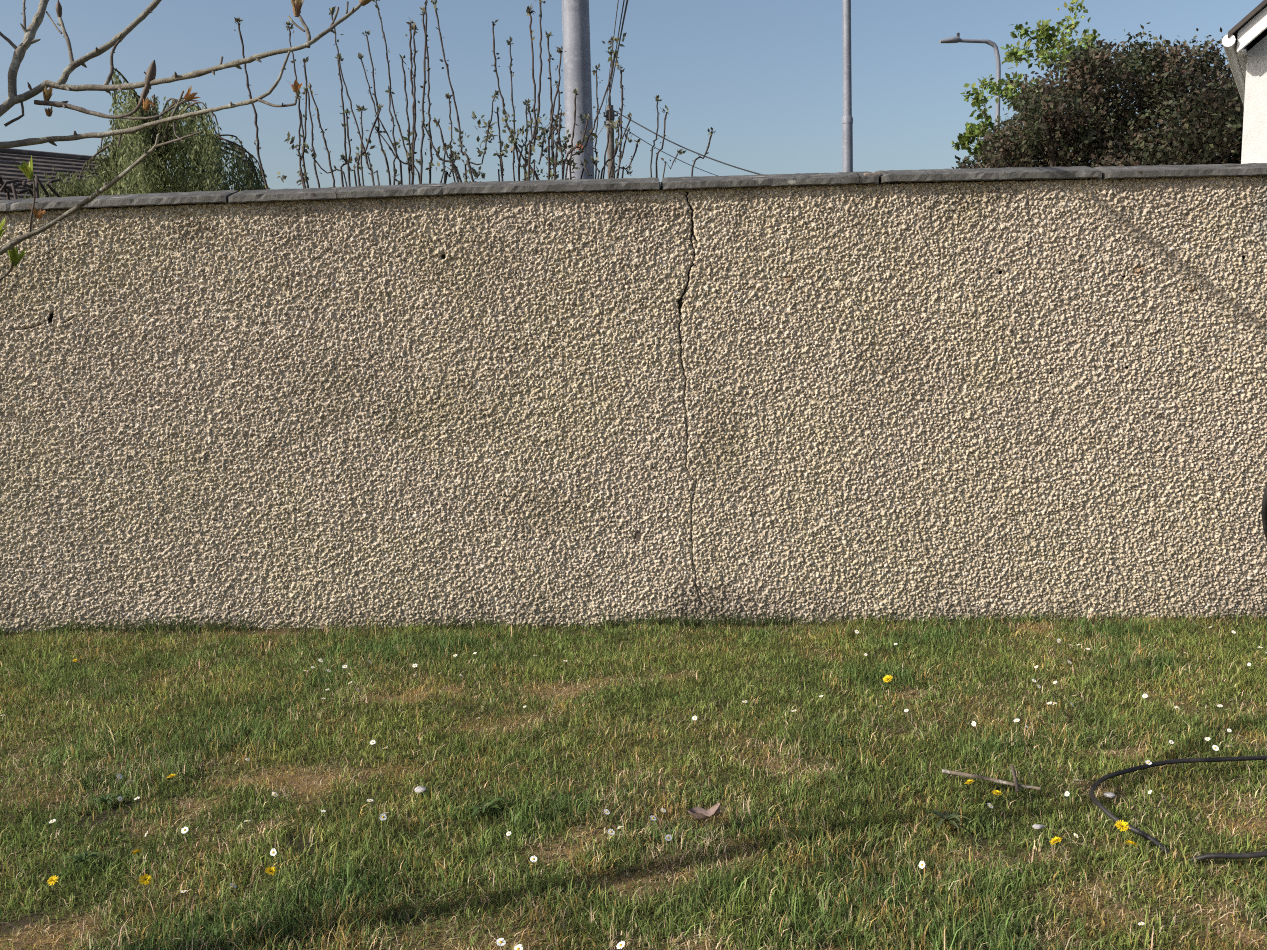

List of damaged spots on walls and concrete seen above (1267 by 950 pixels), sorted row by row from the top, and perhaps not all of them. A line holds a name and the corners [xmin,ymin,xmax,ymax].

crack [677,192,708,601]